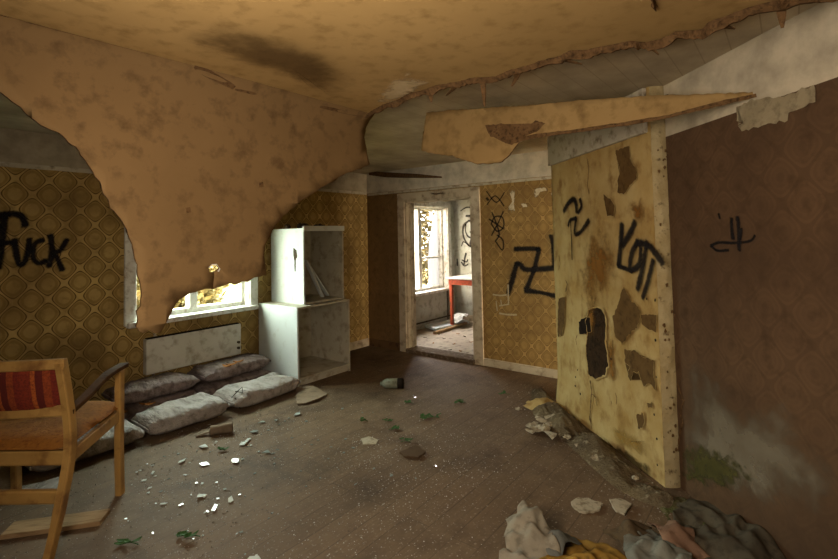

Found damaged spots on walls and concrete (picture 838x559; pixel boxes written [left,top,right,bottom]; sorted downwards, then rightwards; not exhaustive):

crack [650,0,658,11]
spalling [509,94,757,144]
peeling [603,146,637,217]
peeling [557,297,565,337]
flaking render [577,287,670,391]
peeling [636,402,655,430]
water stain [694,395,816,492]